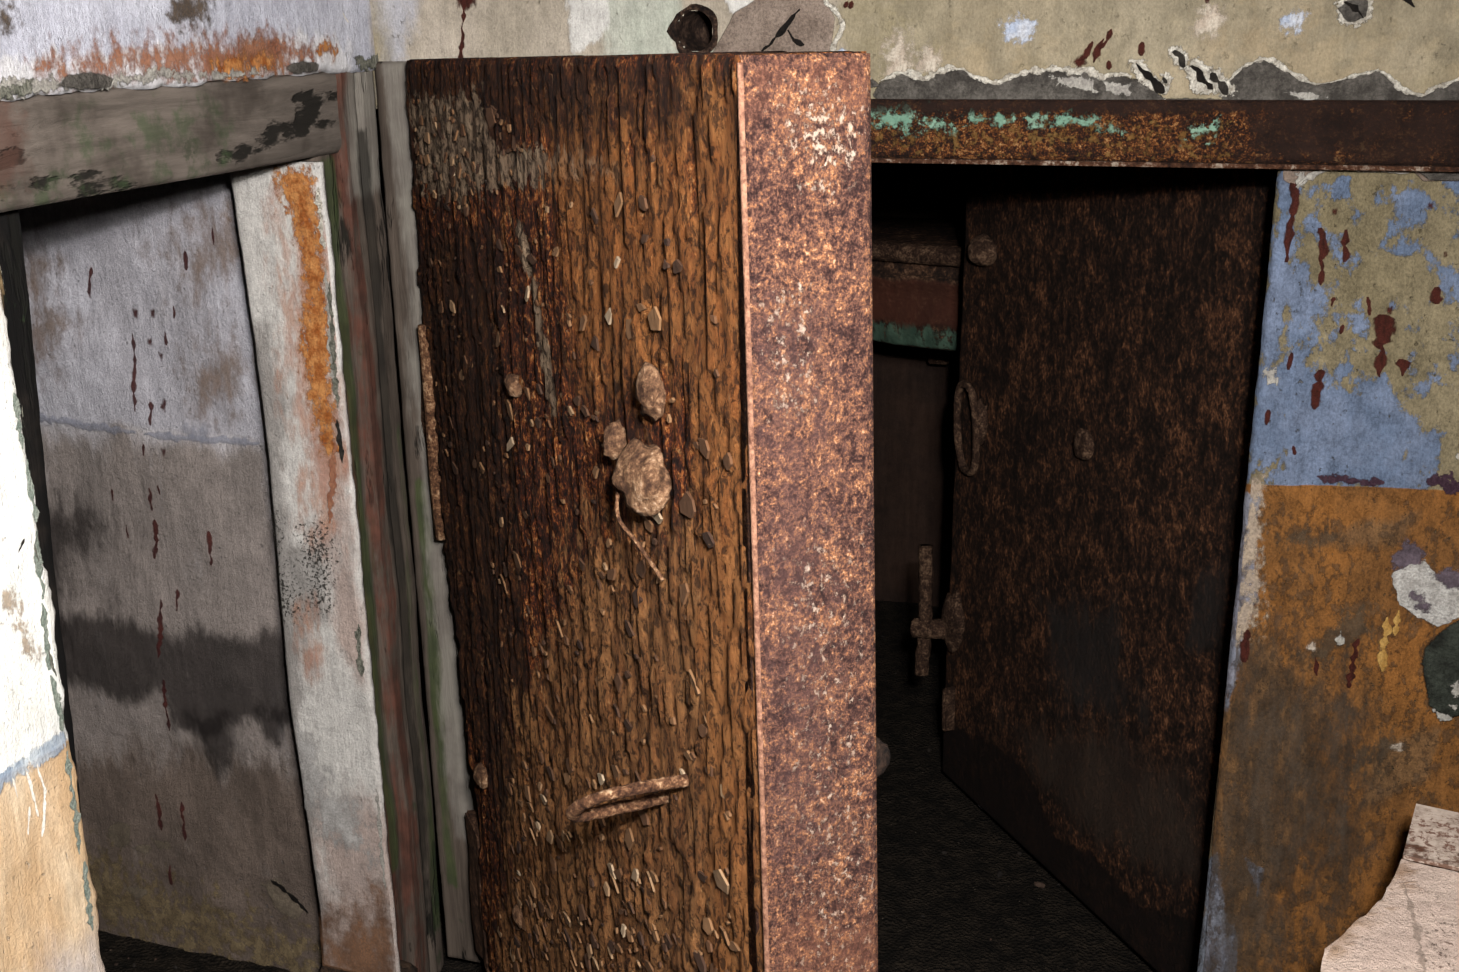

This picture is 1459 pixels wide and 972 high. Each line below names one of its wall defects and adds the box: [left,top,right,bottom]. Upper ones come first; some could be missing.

corrosion [35,24,339,83]
spalling [667,0,846,53]
spalling [870,45,1459,100]
spalling [1334,0,1374,29]
damp [131,306,175,426]
corrosion [272,162,339,523]
corrosion [438,384,611,475]
damp [50,507,92,593]
damp [148,485,160,559]
damp [60,510,341,772]
spalling [1377,539,1459,672]
corrosion [497,751,741,972]